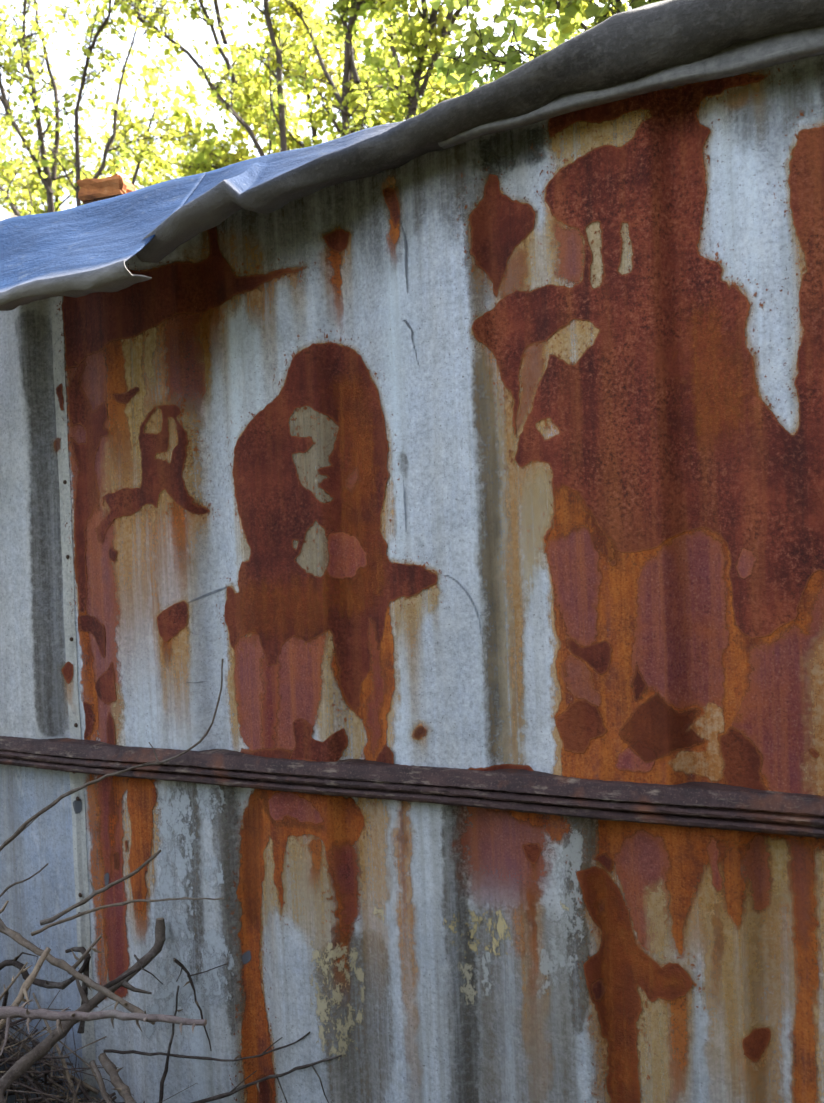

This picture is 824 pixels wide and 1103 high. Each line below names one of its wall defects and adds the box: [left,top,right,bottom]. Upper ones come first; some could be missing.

rust [382,176,400,250]
water stain [23,318,64,736]
rust [54,226,449,764]
rust [457,62,824,796]
rust [73,772,160,999]
rust [217,789,418,1103]
peeling [309,933,392,1103]
rust [452,806,571,1019]
rust [566,820,824,1103]